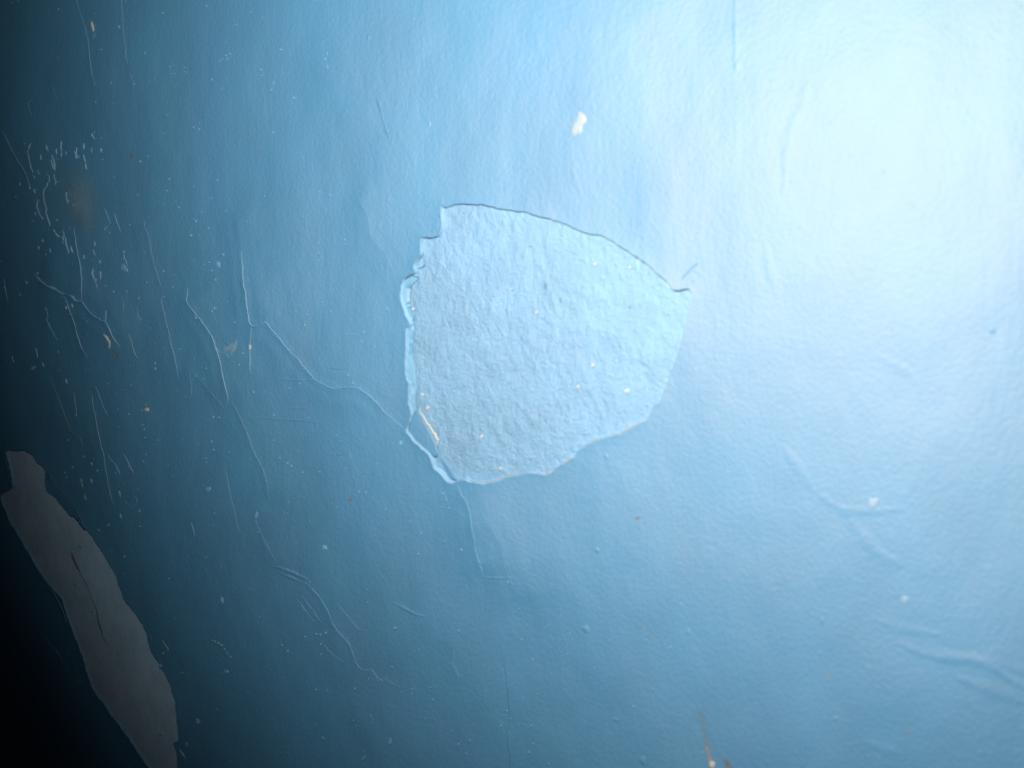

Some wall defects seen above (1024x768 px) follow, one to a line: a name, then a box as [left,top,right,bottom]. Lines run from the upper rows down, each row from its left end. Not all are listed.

crack [35,230,120,356]
crack [50,376,114,505]
crack [144,223,403,561]
peeling [399,204,692,485]
peeling [1,450,188,768]